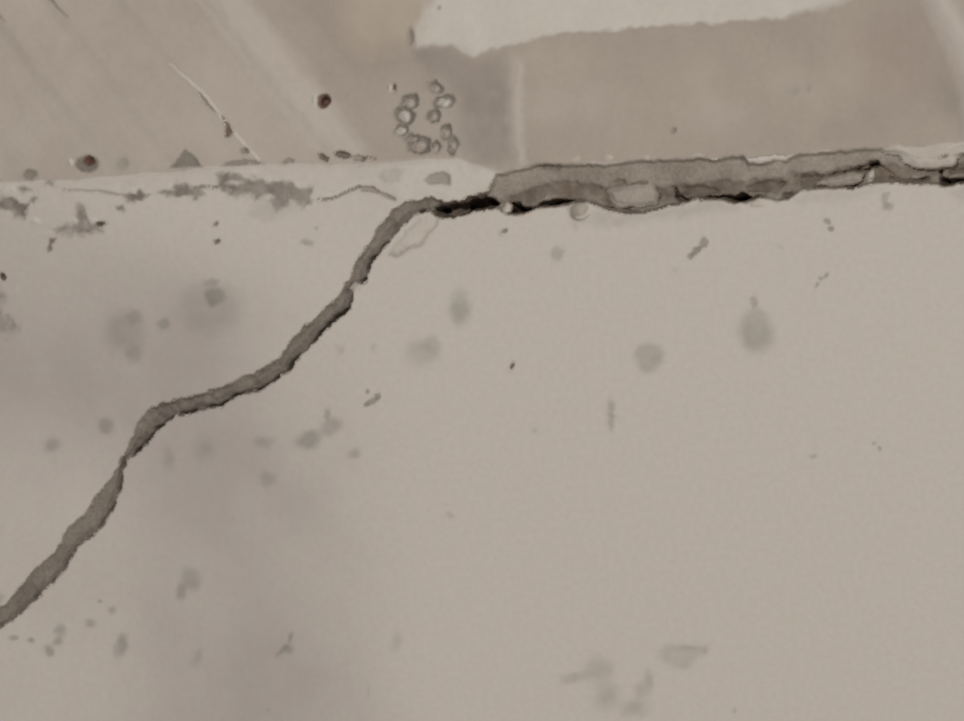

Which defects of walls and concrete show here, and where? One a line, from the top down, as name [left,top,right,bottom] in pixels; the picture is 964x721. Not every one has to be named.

spalling [220,113,236,139]
peeling [0,177,107,254]
peeling [114,145,317,225]
peeling [0,280,24,343]
crack [0,157,964,632]